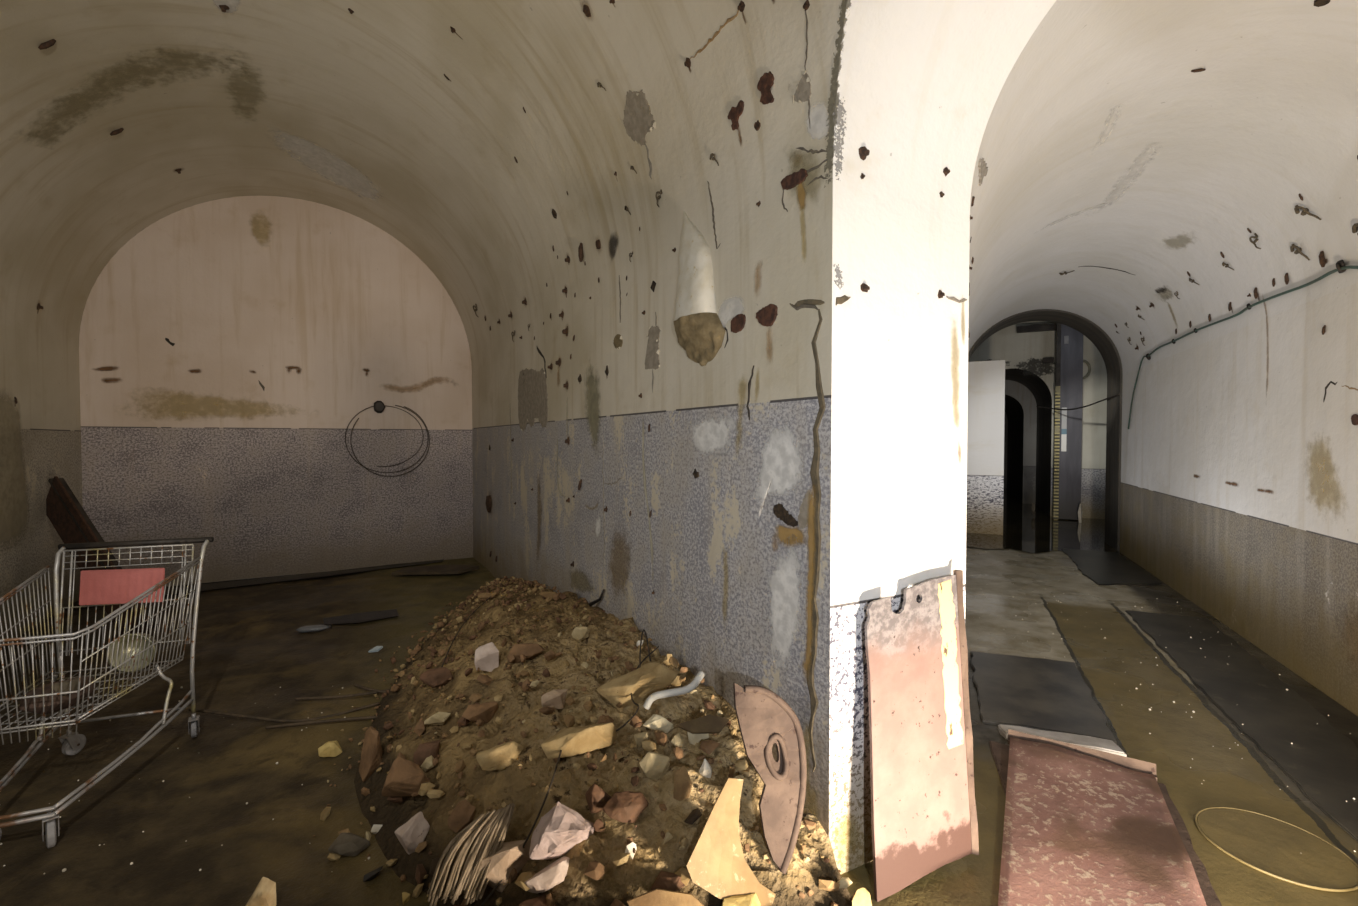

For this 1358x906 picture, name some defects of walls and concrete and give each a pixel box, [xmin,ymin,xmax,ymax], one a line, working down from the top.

crack [1323,381,1358,402]